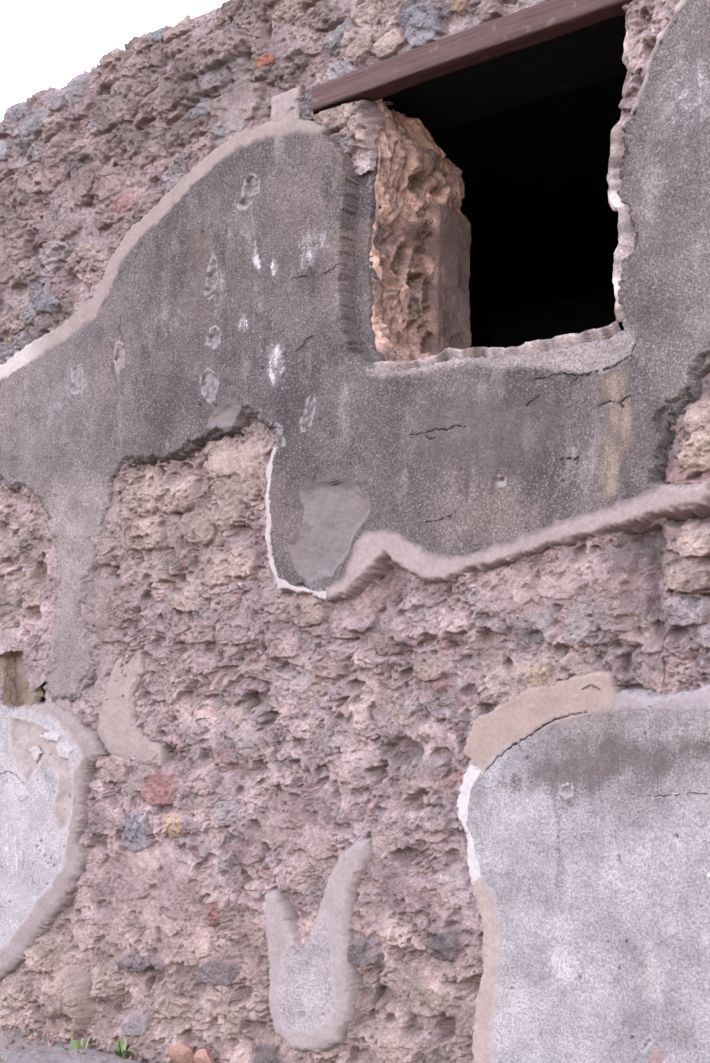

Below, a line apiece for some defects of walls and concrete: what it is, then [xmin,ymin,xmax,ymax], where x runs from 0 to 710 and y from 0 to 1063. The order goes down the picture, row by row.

spalling [618,0,680,136]
flaking render [236,171,261,212]
flaking render [203,254,220,301]
flaking render [113,341,126,375]
flaking render [205,324,222,351]
crack [525,343,637,408]
crack [408,425,467,441]
spalling [0,363,710,1063]
crack [484,683,601,773]